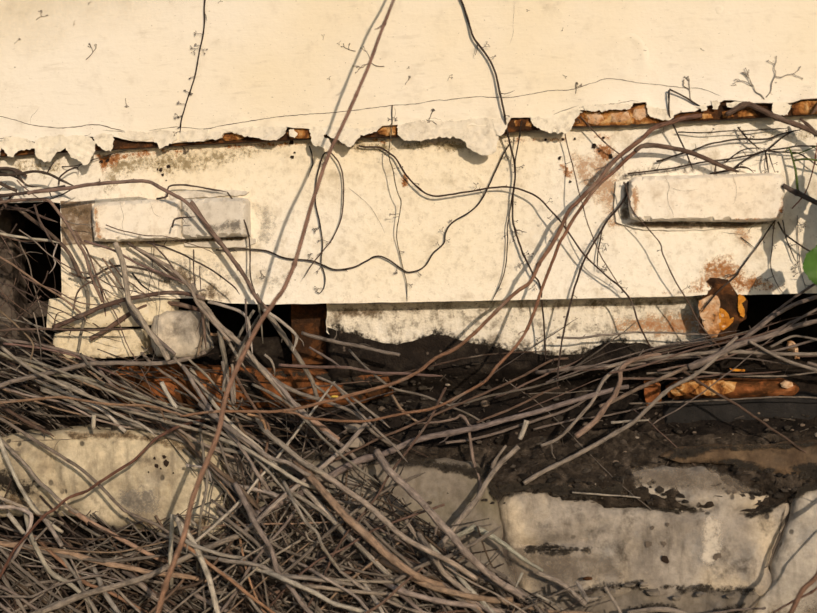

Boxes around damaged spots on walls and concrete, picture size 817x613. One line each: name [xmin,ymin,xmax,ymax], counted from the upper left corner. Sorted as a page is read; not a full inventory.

peeling [531,103,631,134]
peeling [646,105,674,120]
corrosion [573,104,773,126]
peeling [697,100,741,111]
peeling [772,102,792,116]
peeling [0,126,298,165]
peeling [309,125,381,150]
peeling [397,117,508,156]
corrosion [560,137,618,227]
corrosion [614,256,772,343]
corrosion [665,377,800,400]